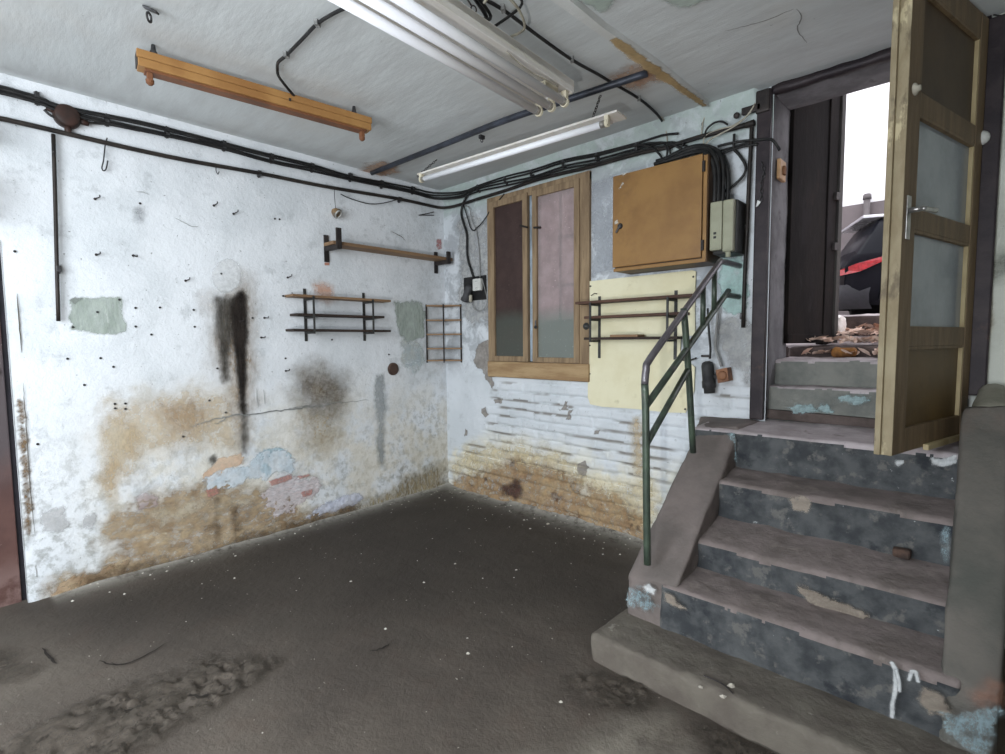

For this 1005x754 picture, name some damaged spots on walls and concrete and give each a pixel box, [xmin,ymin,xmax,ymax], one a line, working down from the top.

leakage [302,371,342,403]
leakage [105,392,247,497]
peeling [202,448,363,519]
leakage [47,445,653,592]
spalling [789,496,811,512]
peeling [626,584,686,610]
spalling [798,586,869,619]
crack [42,648,56,663]
crack [99,644,164,665]
crack [187,688,231,698]
peeling [917,688,1003,752]